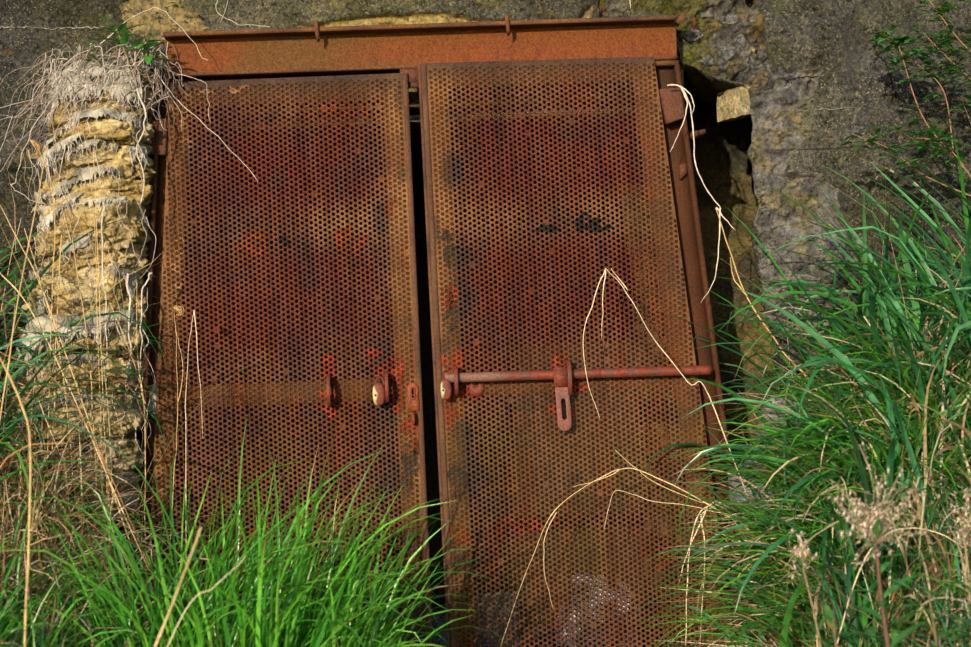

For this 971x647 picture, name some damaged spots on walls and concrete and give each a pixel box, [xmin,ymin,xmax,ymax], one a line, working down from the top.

rust [316,102,371,127]
spalling [573,0,856,343]
rust [236,231,269,257]
rust [332,225,369,258]
rust [169,226,185,313]
rust [500,516,560,545]